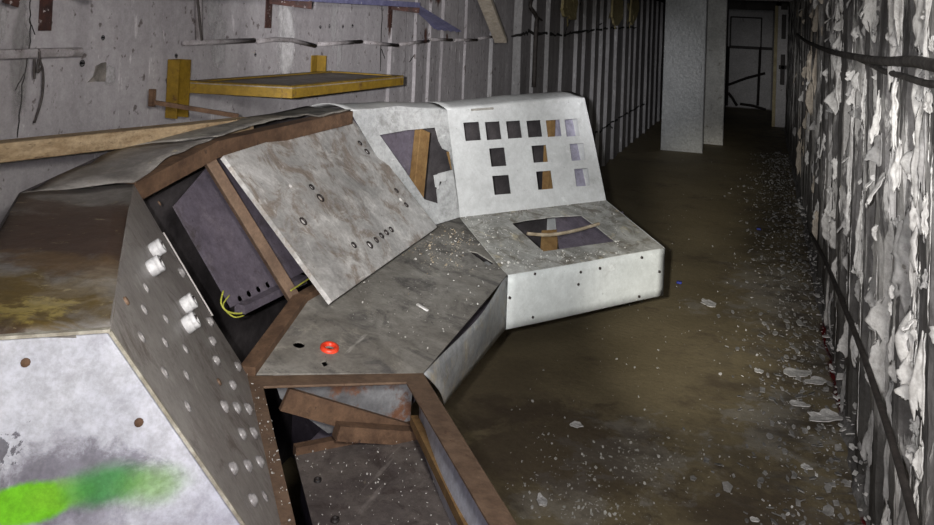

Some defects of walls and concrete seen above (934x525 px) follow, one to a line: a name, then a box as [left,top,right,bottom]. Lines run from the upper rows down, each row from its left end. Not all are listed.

peeling [792,0,934,525]